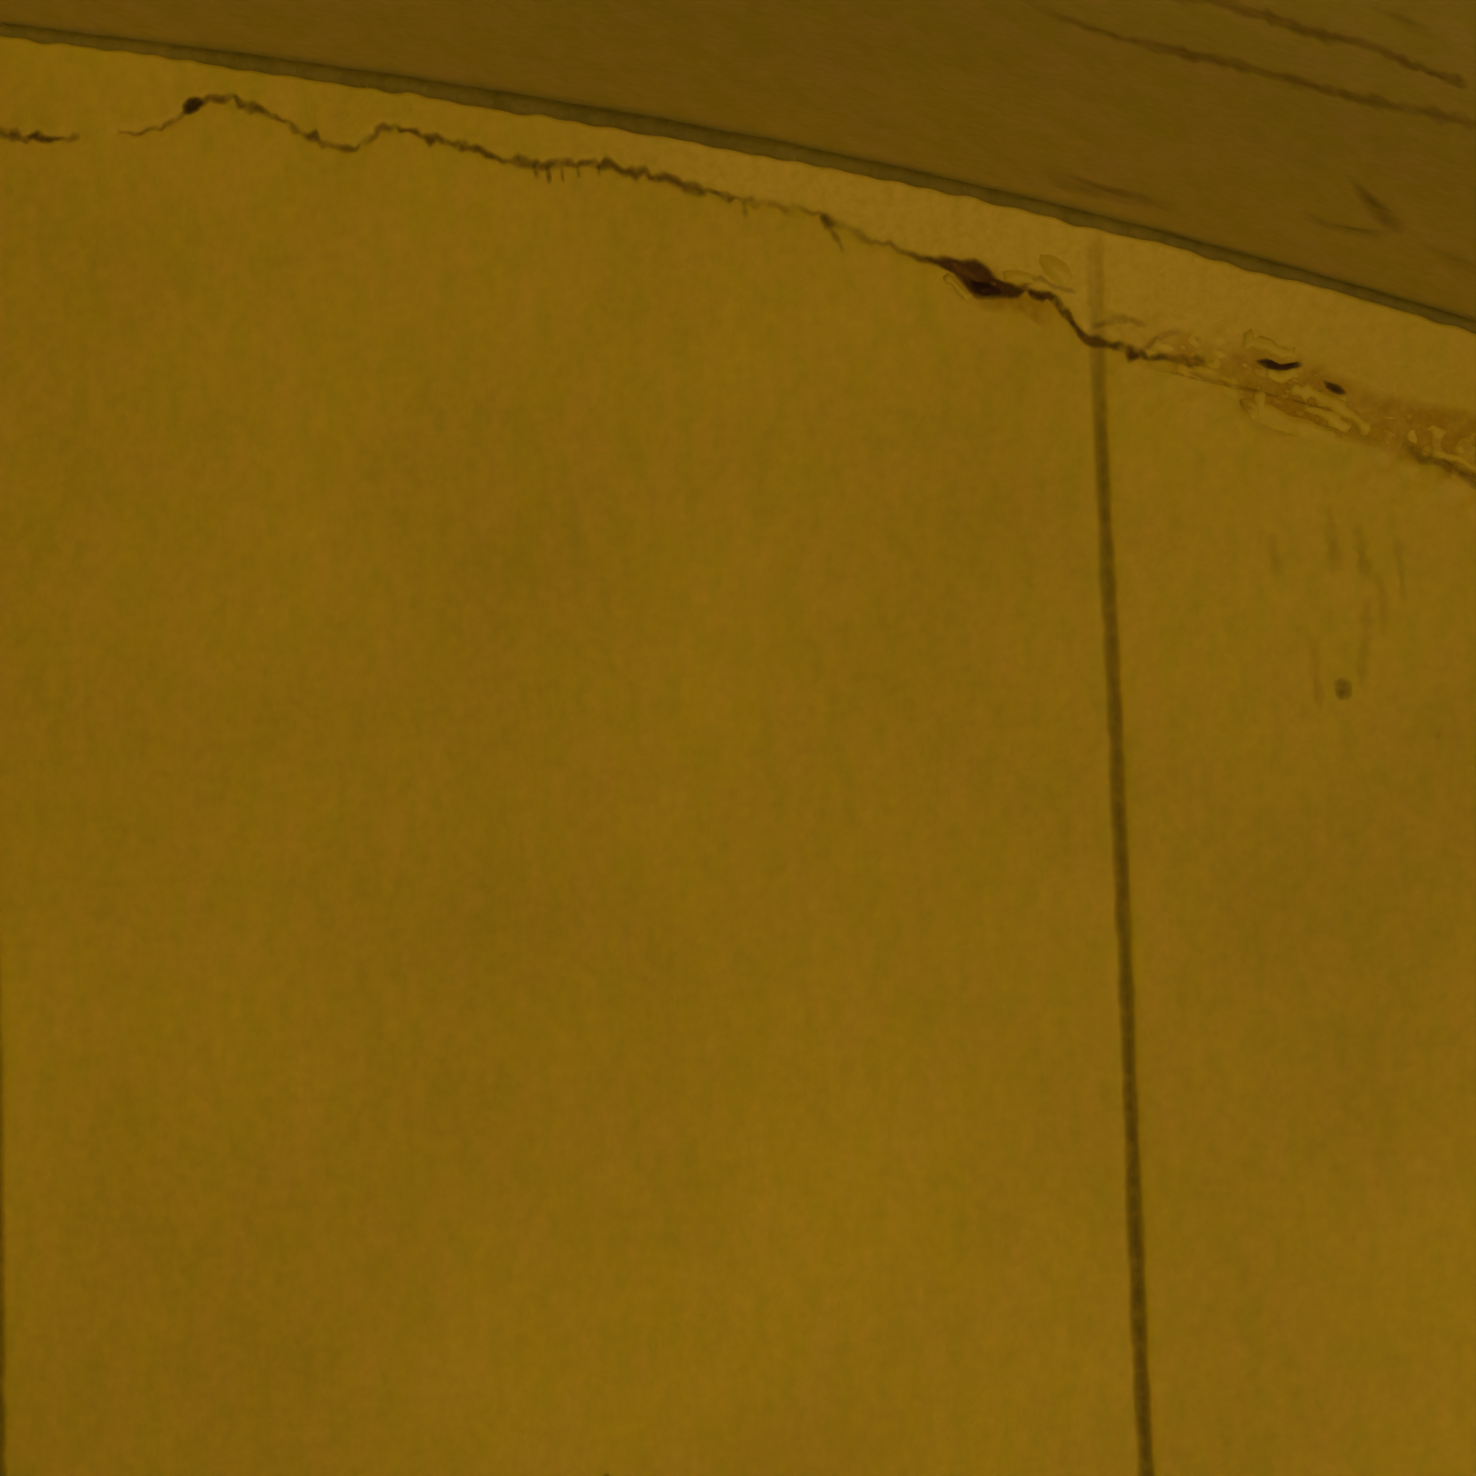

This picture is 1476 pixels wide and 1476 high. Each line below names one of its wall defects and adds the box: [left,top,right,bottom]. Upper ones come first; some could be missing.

crack [10,132,59,142]
crack [200,96,354,150]
crack [399,129,731,200]
crack [910,254,932,262]
crack [1005,287,1185,360]
peeling [1242,329,1373,436]